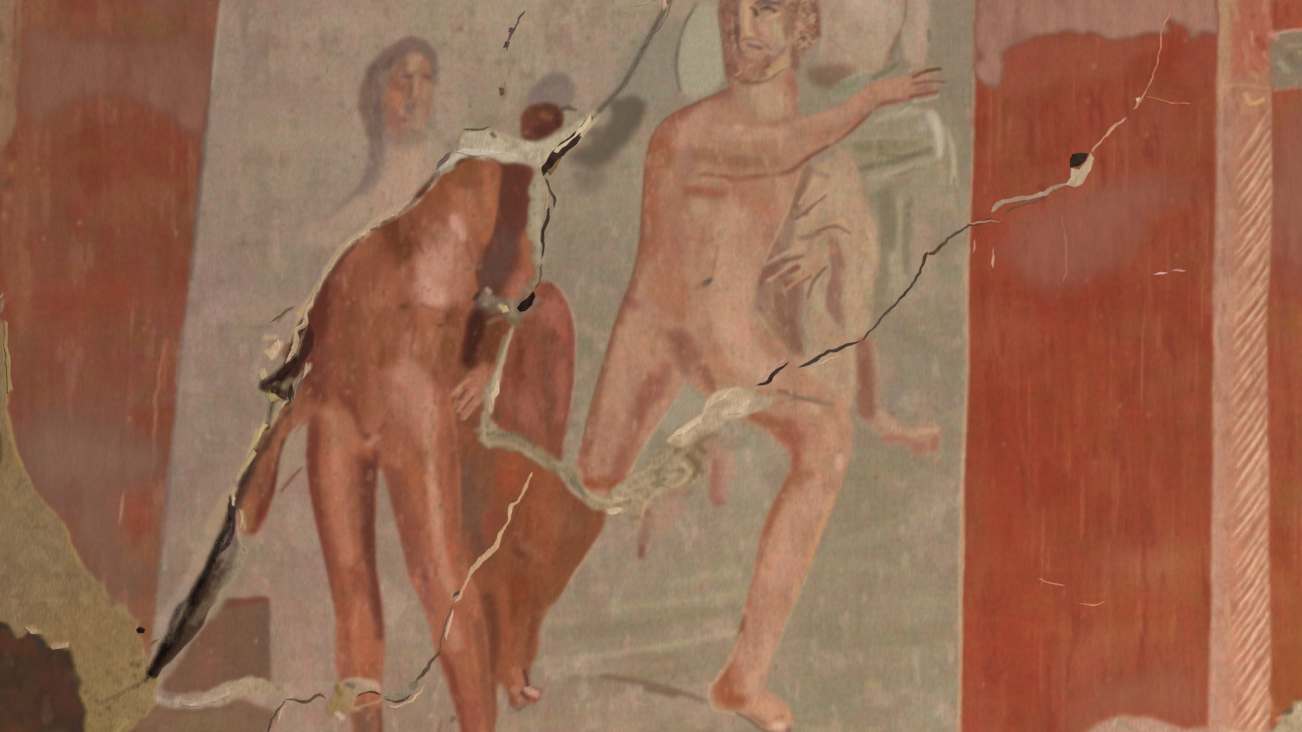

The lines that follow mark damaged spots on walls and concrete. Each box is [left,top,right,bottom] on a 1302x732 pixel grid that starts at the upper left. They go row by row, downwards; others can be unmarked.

crack [499,10,526,96]
crack [623,0,672,91]
crack [0,293,8,313]
crack [517,119,587,312]
flaking render [415,108,777,528]
crack [756,7,1191,386]
flaking render [0,320,284,732]
crack [151,200,411,677]
crack [358,472,533,708]
crack [267,693,325,732]
flaking render [1086,699,1302,732]